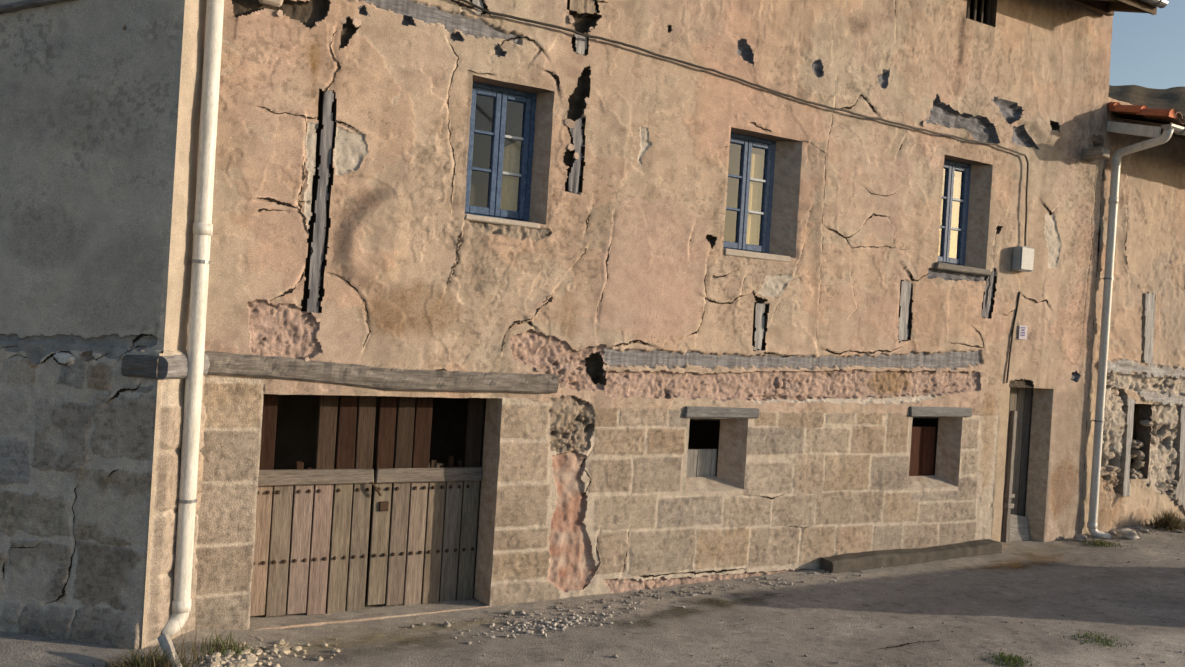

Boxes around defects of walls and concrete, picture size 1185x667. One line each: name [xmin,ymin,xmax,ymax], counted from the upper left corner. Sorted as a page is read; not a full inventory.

peeling [303,122,318,235]
crack [258,31,371,348]
peeling [333,126,369,176]
crack [446,0,560,288]
crack [796,91,925,355]
spalling [919,94,1040,150]
crack [0,334,156,404]
spalling [247,298,324,361]
crack [502,290,555,352]
crack [689,234,749,335]
spalling [510,329,984,593]
spalling [1100,370,1185,510]